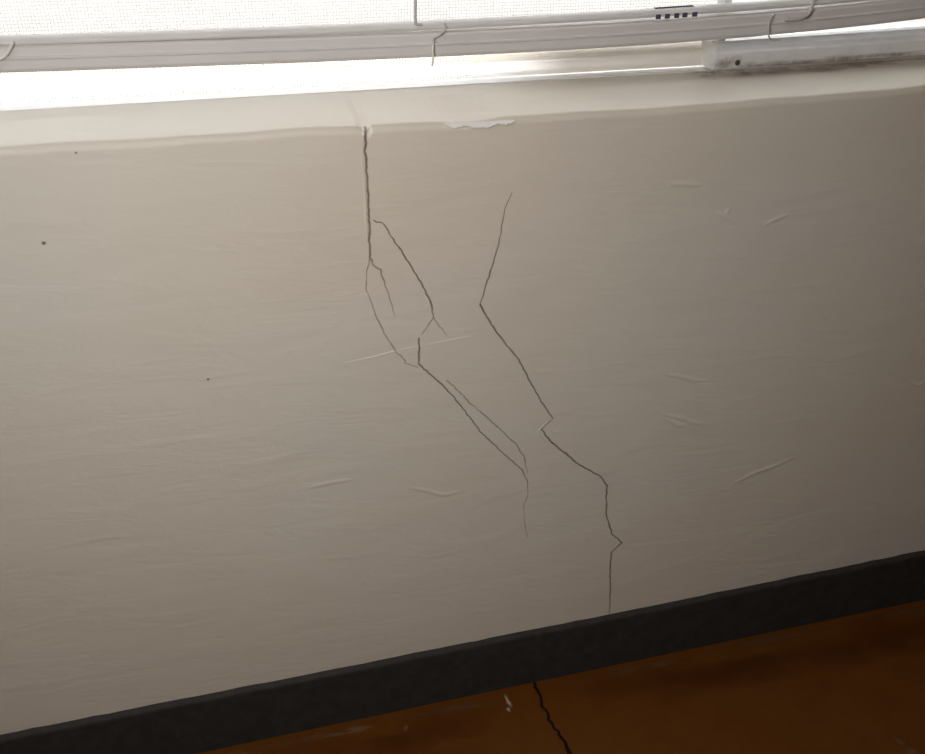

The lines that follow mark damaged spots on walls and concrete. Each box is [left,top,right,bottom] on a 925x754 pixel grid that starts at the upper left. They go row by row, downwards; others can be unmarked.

crack [361,126,433,308]
crack [418,338,524,474]
crack [479,194,622,594]
crack [533,682,572,754]